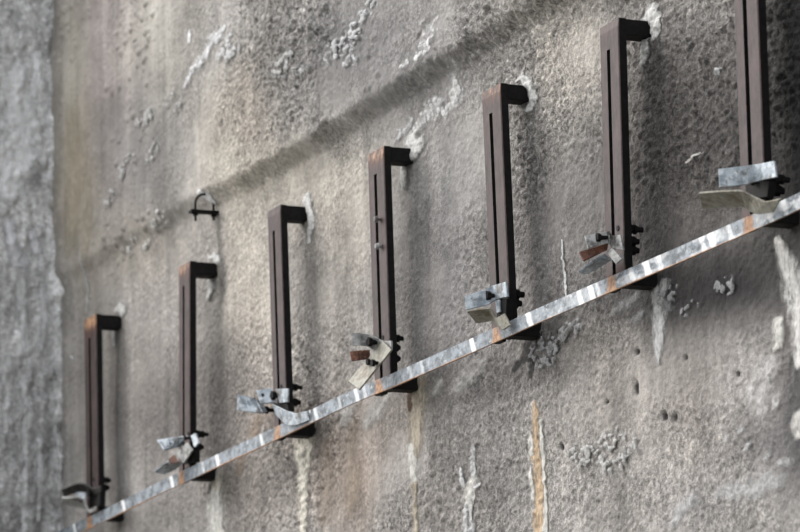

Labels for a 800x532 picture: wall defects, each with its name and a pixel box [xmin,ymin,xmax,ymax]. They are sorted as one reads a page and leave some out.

spalling [713,277,734,296]
spalling [528,316,583,369]
efflorescence [458,444,481,532]
rust [528,401,548,532]
spalling [563,427,637,476]